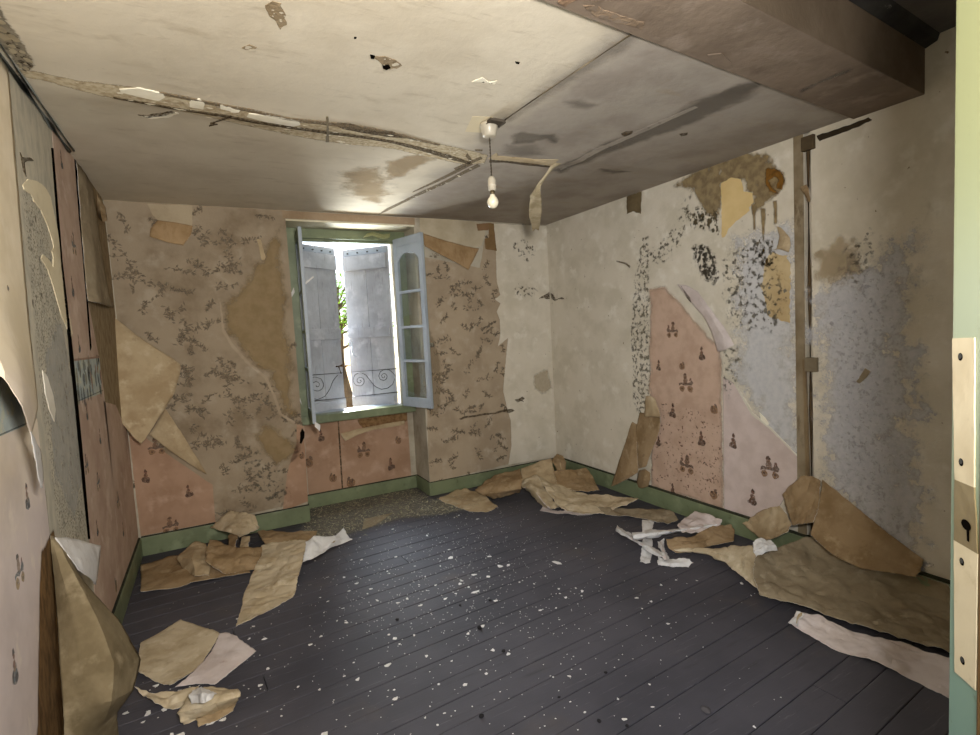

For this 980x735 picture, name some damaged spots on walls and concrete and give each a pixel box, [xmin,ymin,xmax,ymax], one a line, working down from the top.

spalling [265,1,287,30]
crack [113,91,482,215]
peeling [626,191,642,214]
peeling [721,178,754,238]
peeling [761,226,791,323]
peeling [0,10,559,735]
peeling [611,422,638,486]